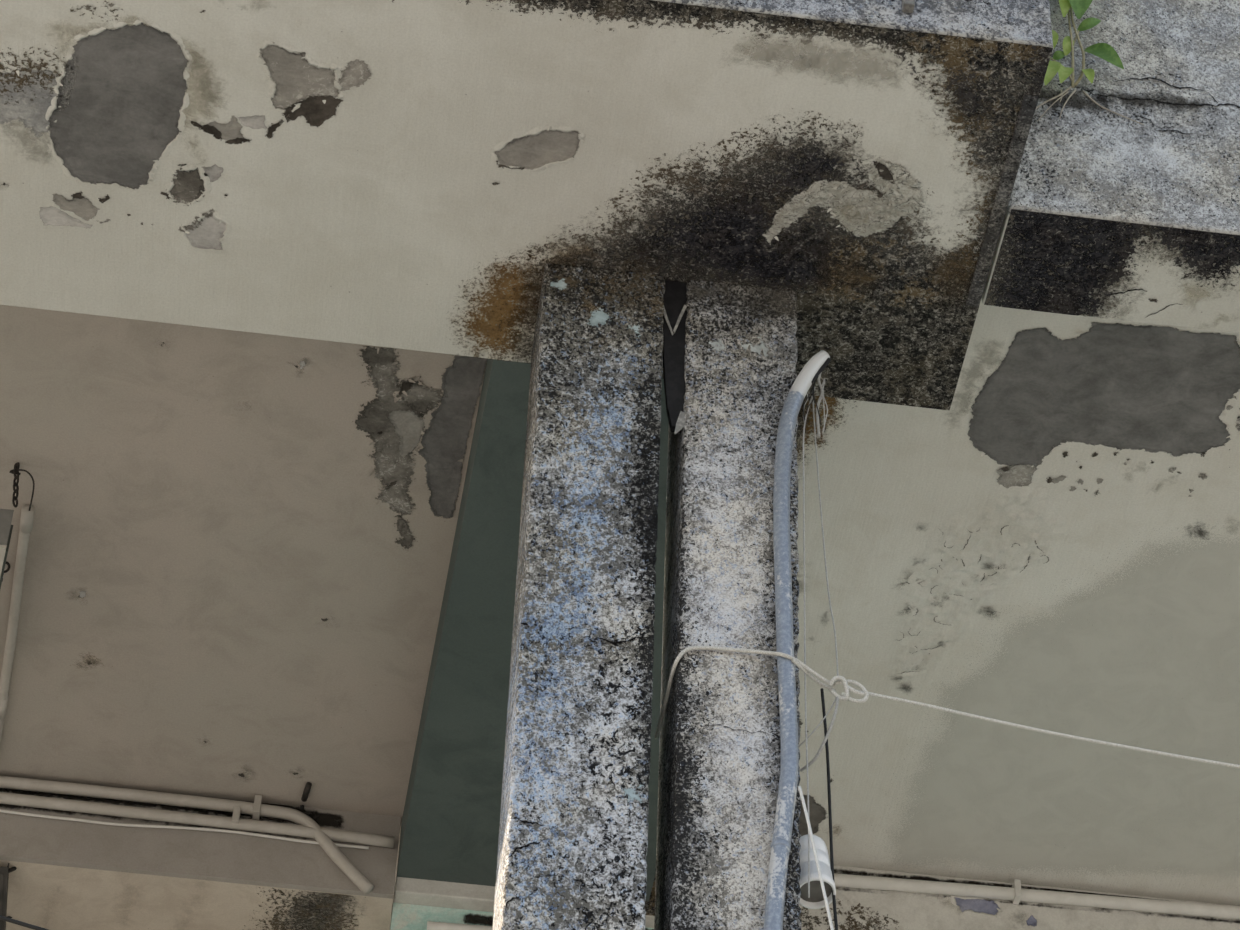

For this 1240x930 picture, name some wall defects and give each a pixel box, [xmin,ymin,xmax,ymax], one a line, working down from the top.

peeling [191,39,371,144]
crack [1078,77,1240,134]
spalling [149,160,227,207]
peeling [491,125,585,185]
peeling [763,160,925,245]
leakage [486,0,1240,451]
peeling [352,346,445,549]
spalling [1060,443,1103,496]
leakage [882,528,1240,883]